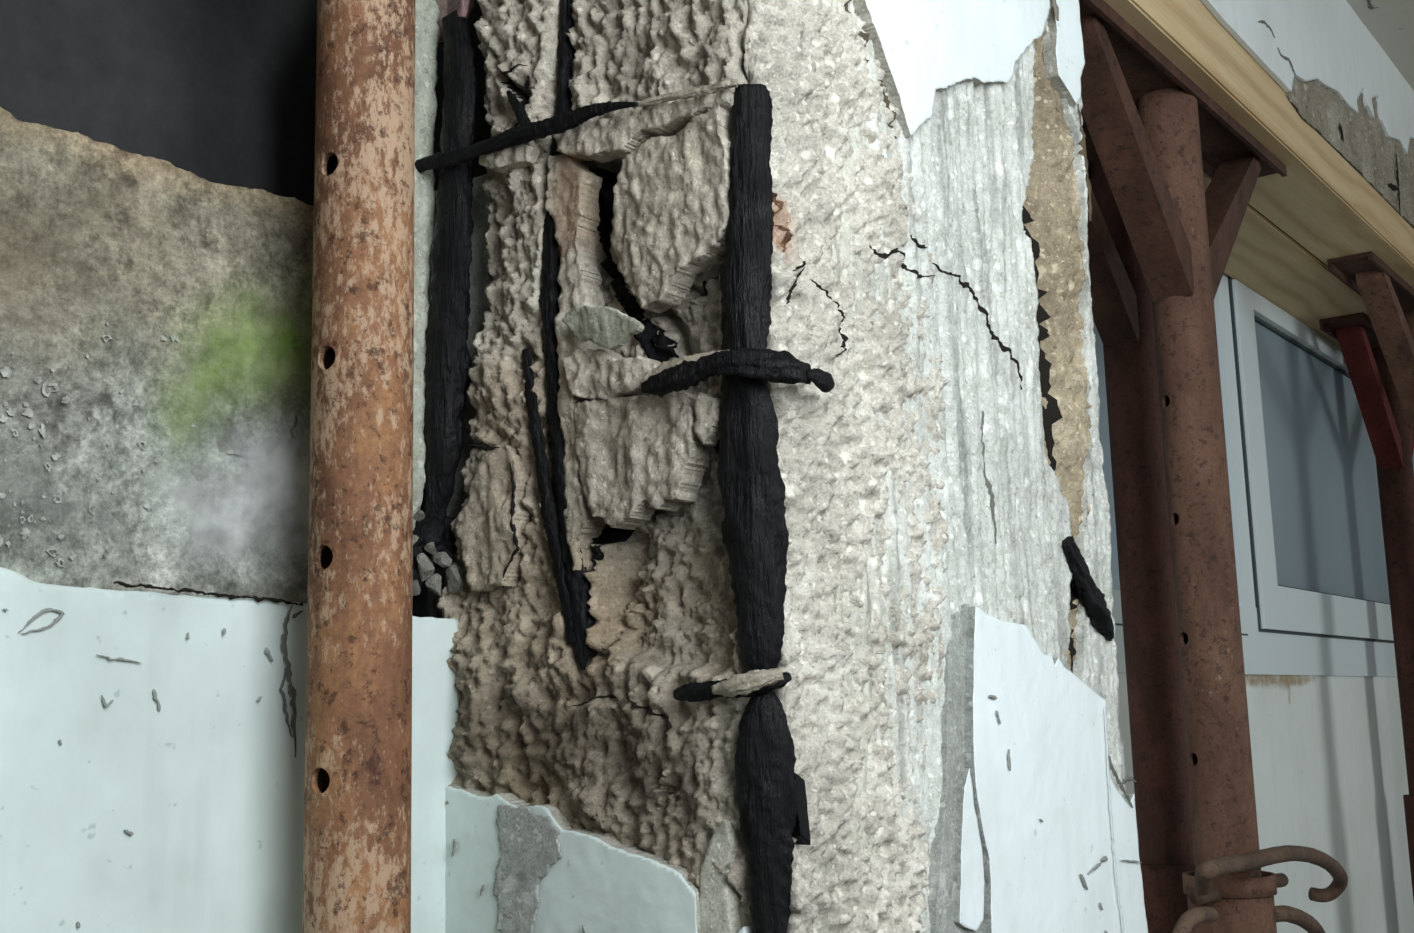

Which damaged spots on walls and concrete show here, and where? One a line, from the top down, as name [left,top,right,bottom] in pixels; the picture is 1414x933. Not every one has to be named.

crack [1258,20,1296,76]
spalling [1286,77,1414,227]
crack [869,0,1093,545]
spalling [412,0,982,933]
crack [1064,579,1081,673]
spalling [1080,856,1142,890]